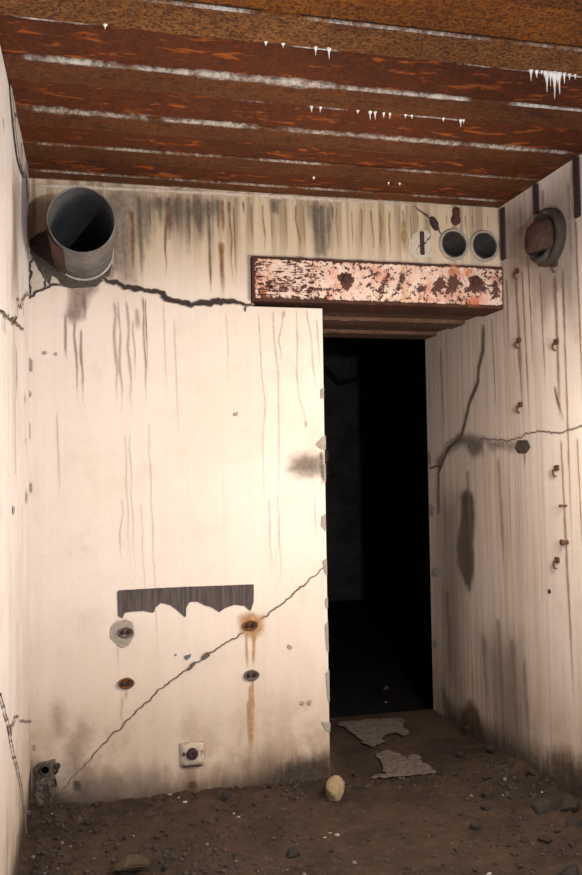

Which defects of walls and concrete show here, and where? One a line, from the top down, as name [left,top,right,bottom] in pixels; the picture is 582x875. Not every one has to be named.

damp [348,87,466,101]
damp [37,170,437,278]
crack [99,277,254,312]
corrosion [338,272,355,290]
crack [429,325,582,512]
peeling [110,584,254,648]
corrosion [241,614,262,660]
crack [64,565,327,788]
crack [0,693,32,834]